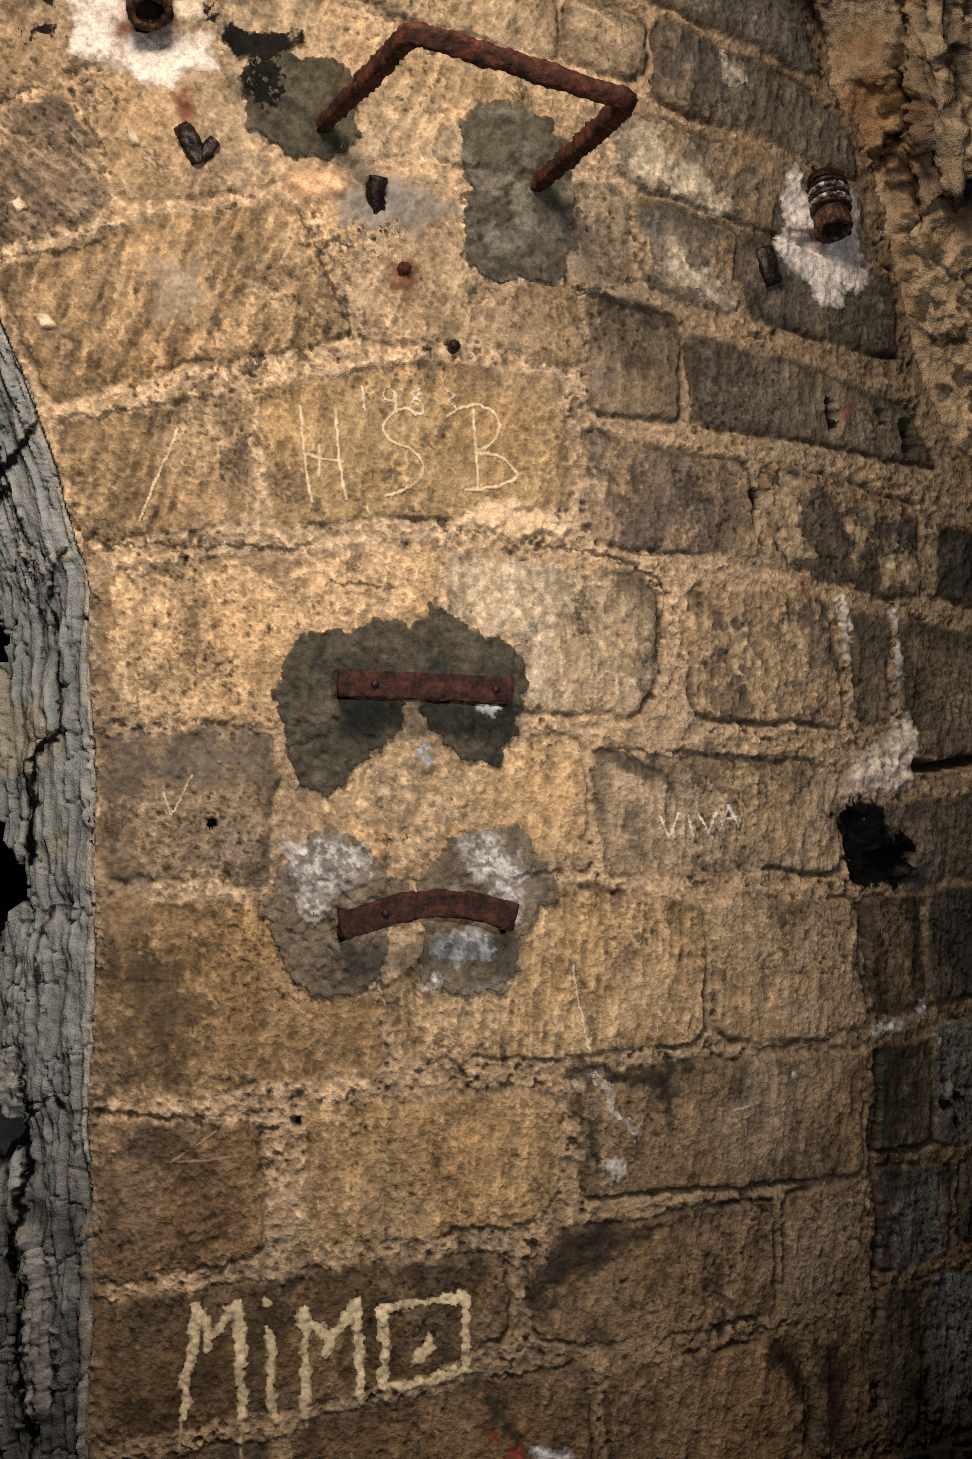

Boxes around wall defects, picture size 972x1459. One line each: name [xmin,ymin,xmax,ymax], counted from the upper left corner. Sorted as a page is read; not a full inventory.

crack [804,0,825,33]
corrosion [117,21,173,36]
crack [0,85,35,103]
crack [37,239,98,255]
crack [107,541,292,551]
crack [0,356,208,865]
water stain [846,717,919,804]